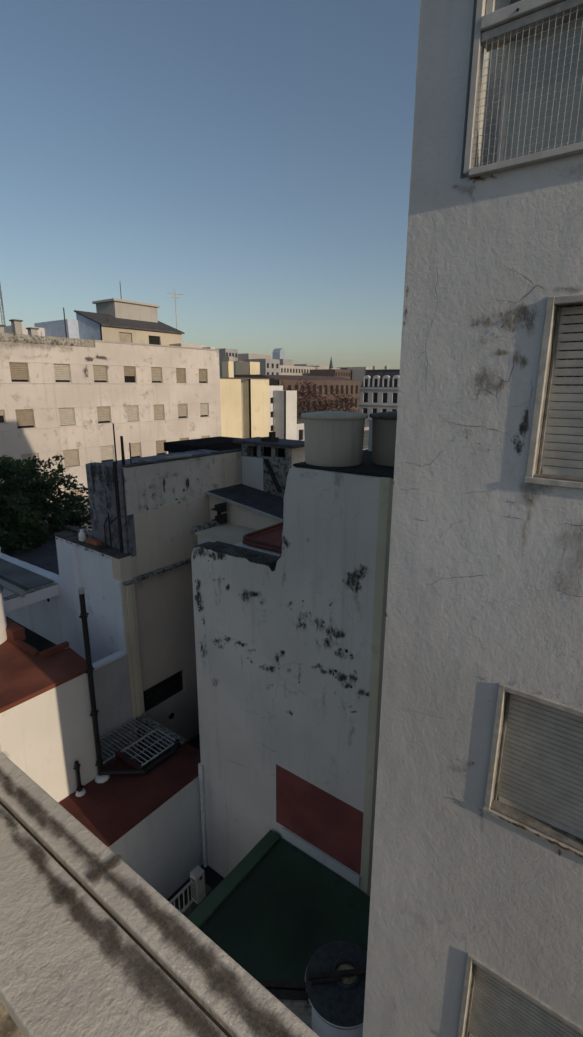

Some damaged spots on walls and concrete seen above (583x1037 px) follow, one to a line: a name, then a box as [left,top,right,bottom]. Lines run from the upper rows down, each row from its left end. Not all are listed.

peeling [476,306,534,365]
water stain [514,410,528,453]
water stain [0,772,292,1037]